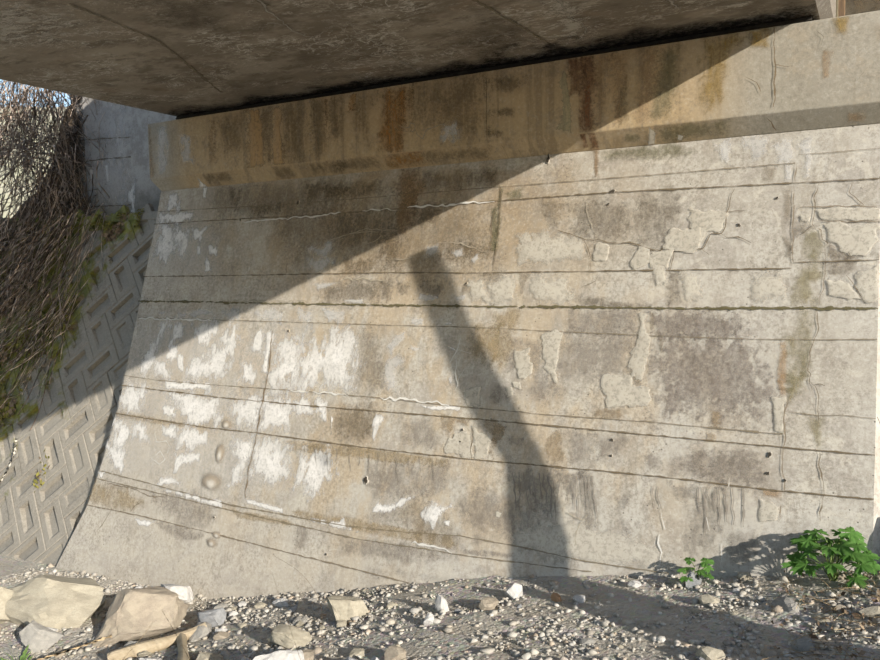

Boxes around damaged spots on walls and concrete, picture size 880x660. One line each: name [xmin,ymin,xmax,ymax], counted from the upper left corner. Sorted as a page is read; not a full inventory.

water stain [169,0,816,146]
crack [746,28,788,130]
water stain [611,123,724,157]
crack [558,189,751,288]
water stain [99,317,359,507]
water stain [247,500,283,513]
water stain [372,414,384,440]
water stain [373,497,411,513]
water stain [421,503,452,529]
crack [779,403,788,514]